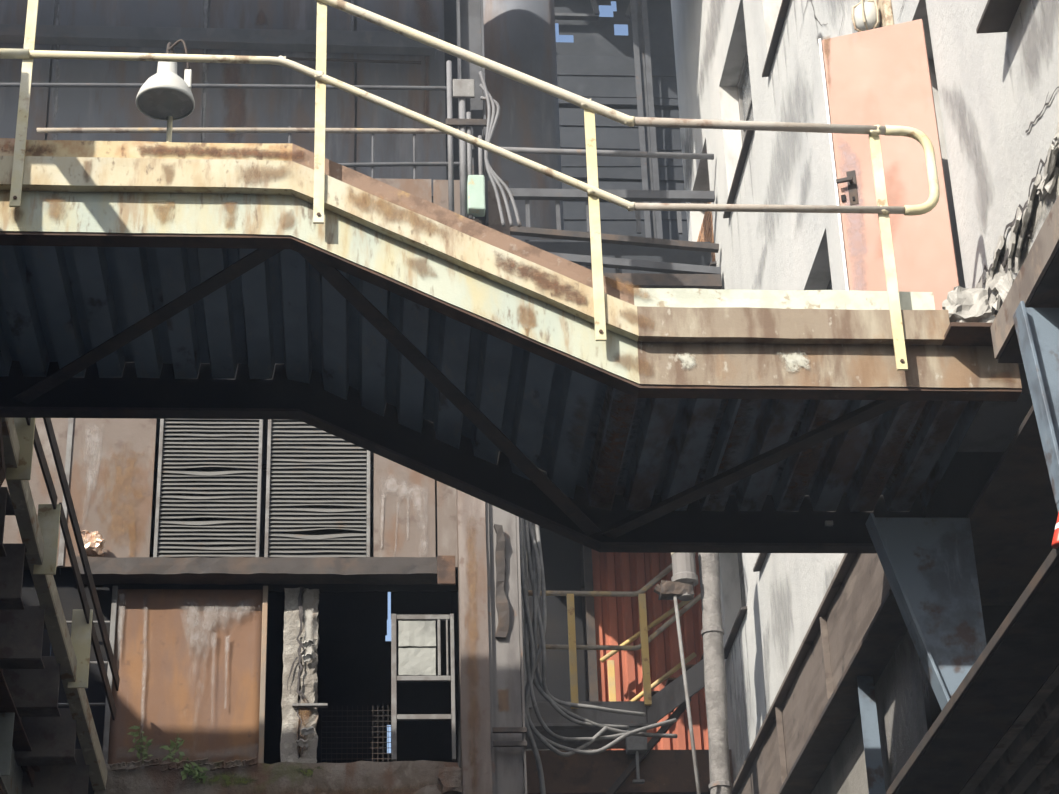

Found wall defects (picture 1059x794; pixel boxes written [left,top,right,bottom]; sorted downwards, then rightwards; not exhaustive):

flaking render [975,122,1059,315]
rust [497,255,587,304]
rust [520,308,535,337]
rust [625,313,647,327]
damp [185,602,250,673]
spalling [302,610,315,663]